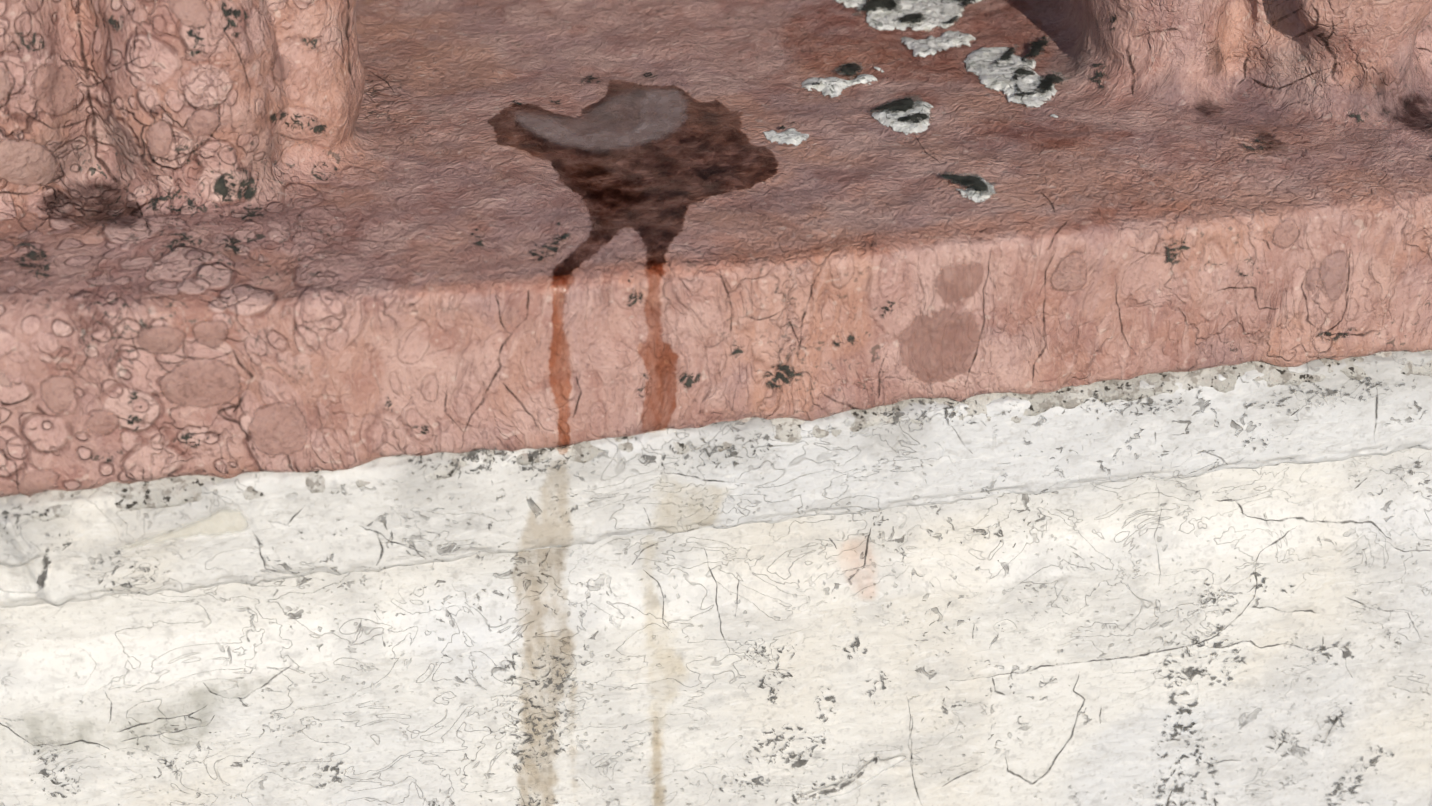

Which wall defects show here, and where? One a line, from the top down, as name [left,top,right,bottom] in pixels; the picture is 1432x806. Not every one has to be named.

crack [950,477,1429,784]